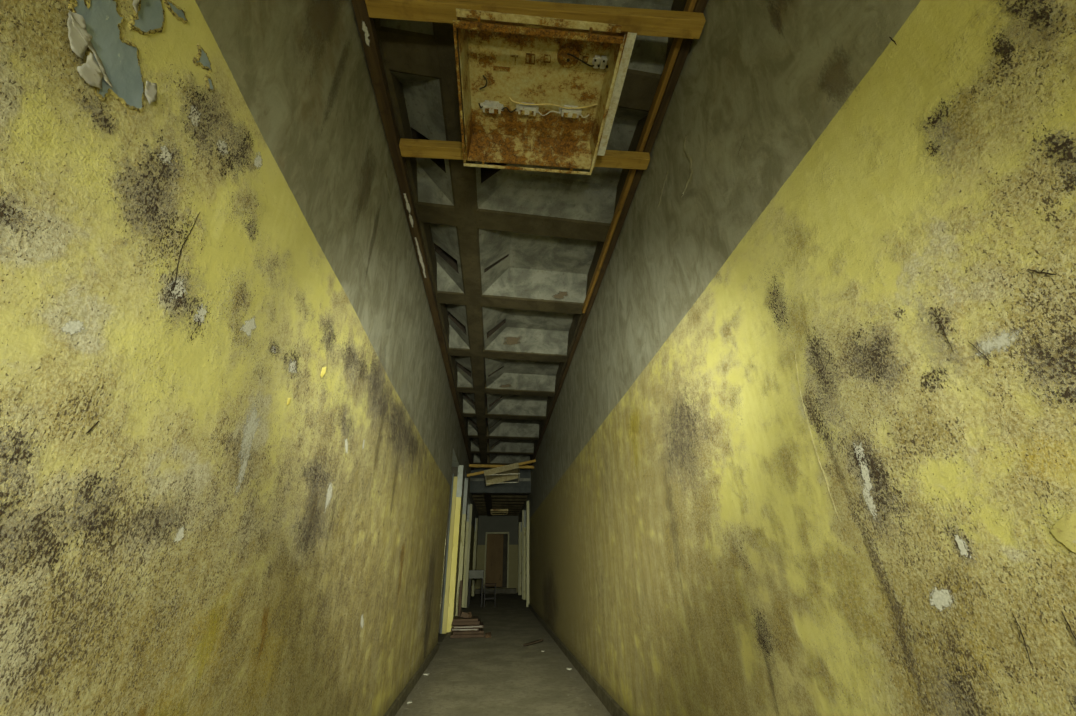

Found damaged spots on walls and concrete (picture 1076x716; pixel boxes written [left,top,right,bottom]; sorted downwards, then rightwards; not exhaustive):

peeling [67,0,188,113]
leakage [987,33,1023,67]
leakage [1000,0,1072,36]
leakage [919,98,956,156]
leakage [1040,125,1076,198]
leakage [109,72,263,345]
leakage [768,277,794,335]
leakage [805,319,902,537]
leakage [0,432,186,586]